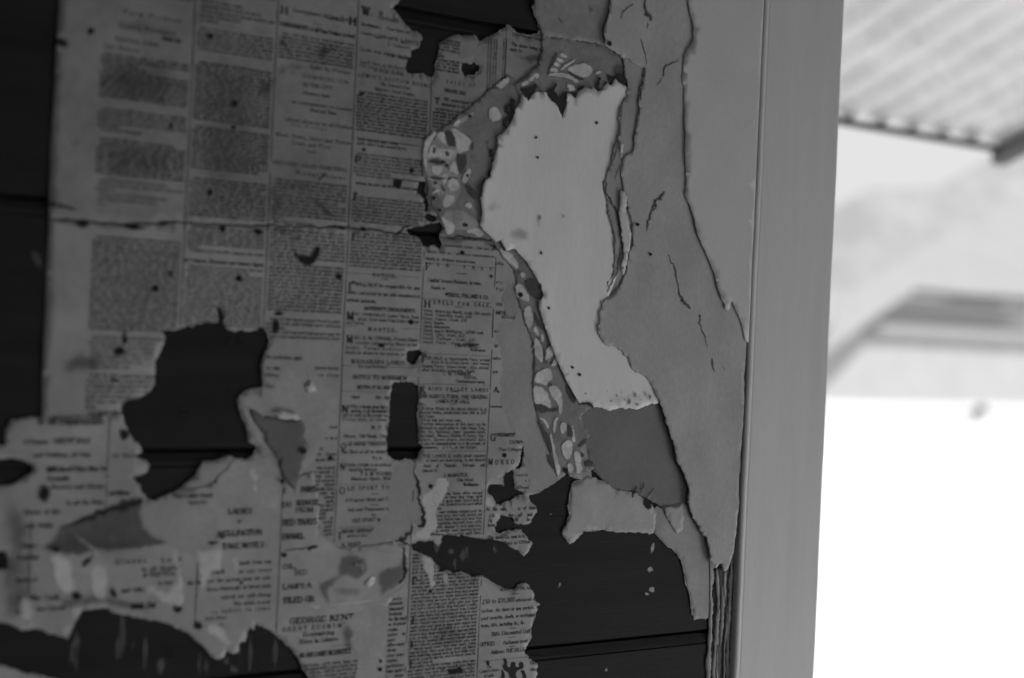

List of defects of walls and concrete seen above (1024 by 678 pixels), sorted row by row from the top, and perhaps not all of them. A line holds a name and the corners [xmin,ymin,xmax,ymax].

spalling [392,0,541,80]
crack [605,0,678,293]
peeling [0,0,59,446]
crack [49,201,409,235]
spalling [406,181,444,248]
peeling [618,190,632,275]
crack [668,255,725,372]
spalling [0,306,339,678]
spalling [365,381,715,678]